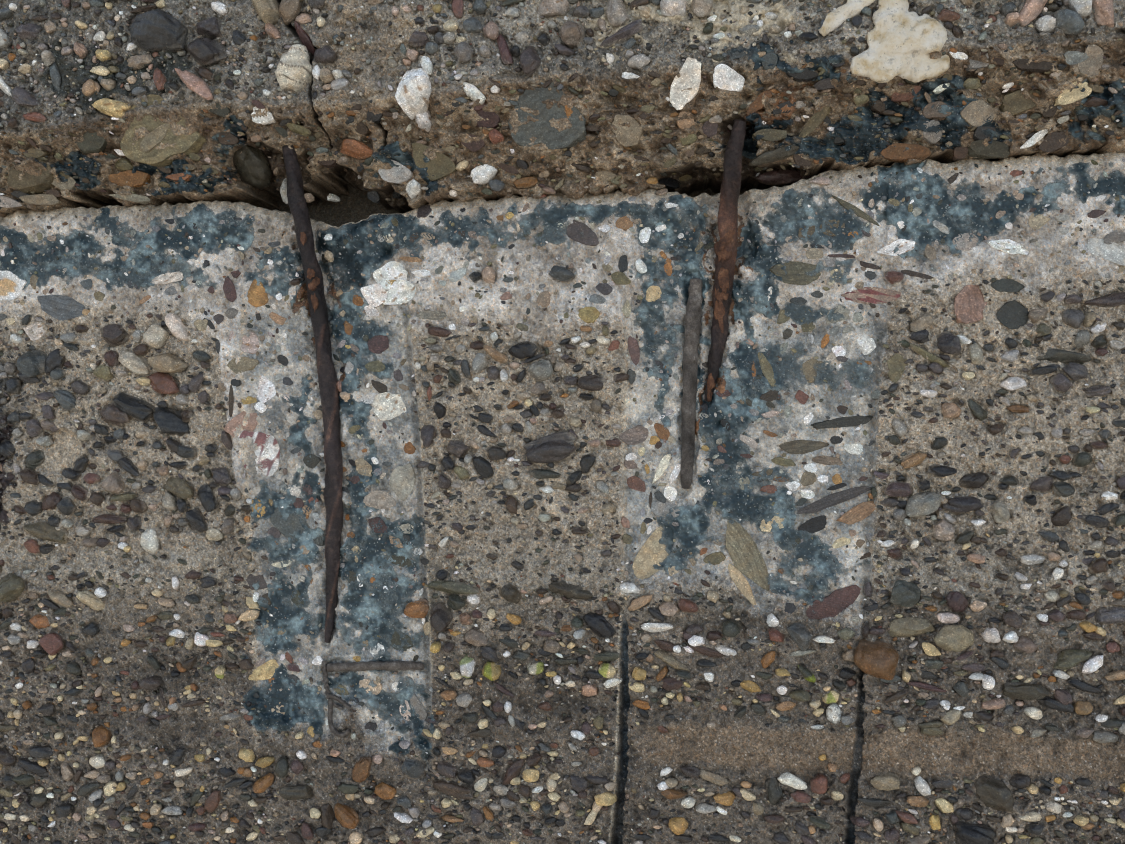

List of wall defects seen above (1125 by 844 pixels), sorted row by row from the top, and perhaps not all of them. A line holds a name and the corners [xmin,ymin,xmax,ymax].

rust [292,251,341,317]
rust [702,215,753,333]
leakage [243,0,1125,760]
rust [695,373,726,435]